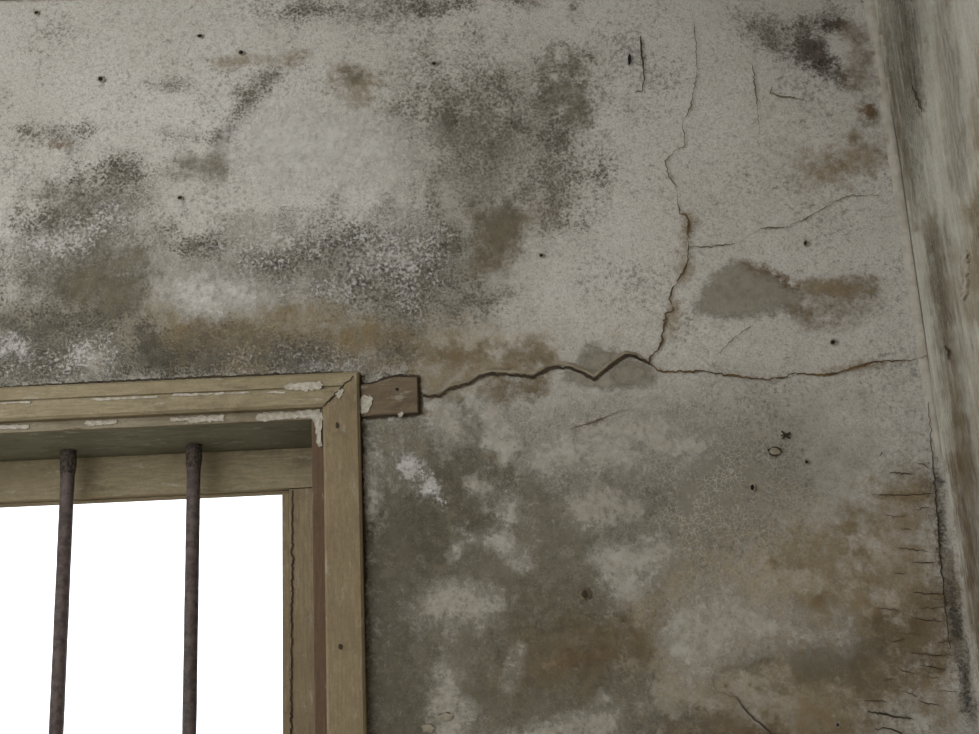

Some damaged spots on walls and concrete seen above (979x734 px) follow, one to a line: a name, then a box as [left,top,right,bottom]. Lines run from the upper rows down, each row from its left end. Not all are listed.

water stain [280,0,475,23]
water stain [743,8,869,91]
water stain [0,39,593,385]
crack [422,24,950,398]
water stain [696,261,876,323]
water stain [566,344,653,389]
water stain [362,392,736,734]
water stain [657,578,860,687]